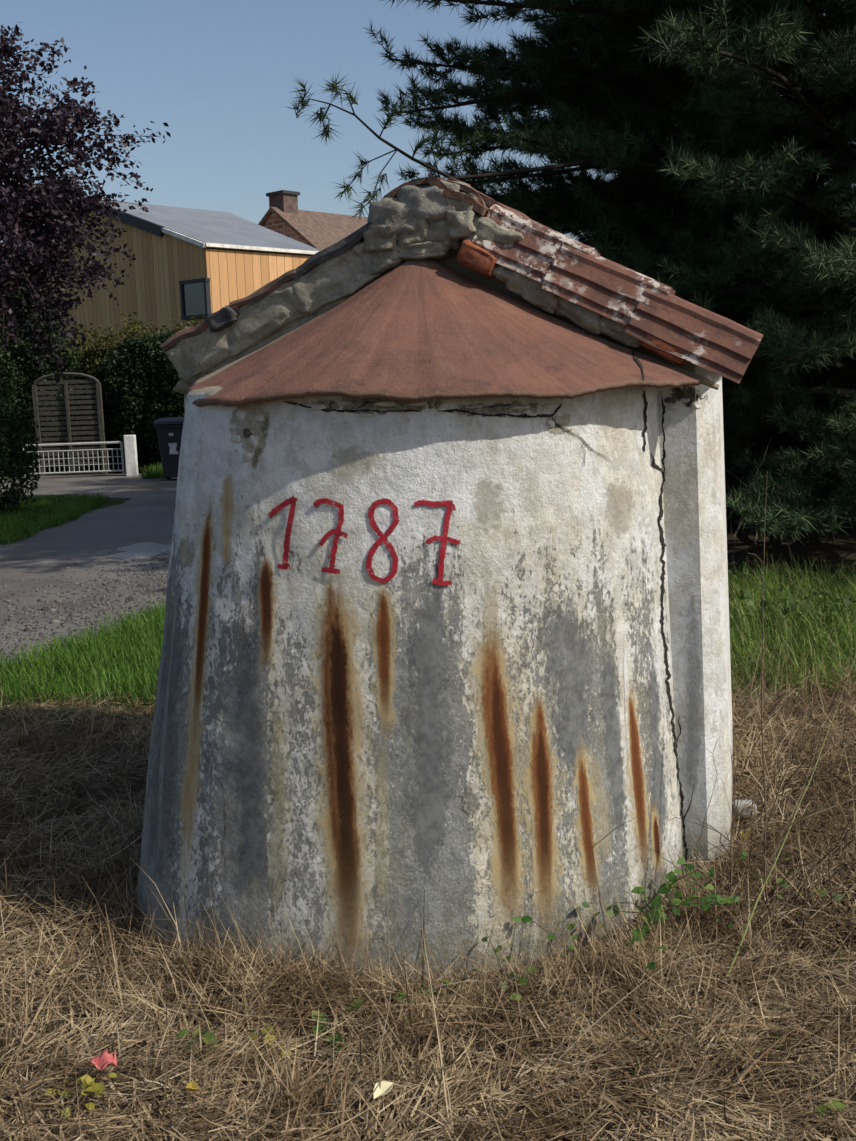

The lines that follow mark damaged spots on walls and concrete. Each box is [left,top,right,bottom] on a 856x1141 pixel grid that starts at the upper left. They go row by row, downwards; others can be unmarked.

spalling [428,173,532,220]
spalling [230,403,268,462]
crack [284,401,613,466]
corrosion [181,480,234,833]
corrosion [258,560,277,659]
corrosion [311,583,397,943]
leakage [403,566,453,876]
corrosion [472,643,599,905]
leakage [539,596,637,829]
corrosion [625,697,663,868]
leakage [646,665,668,837]
crack [632,349,695,863]